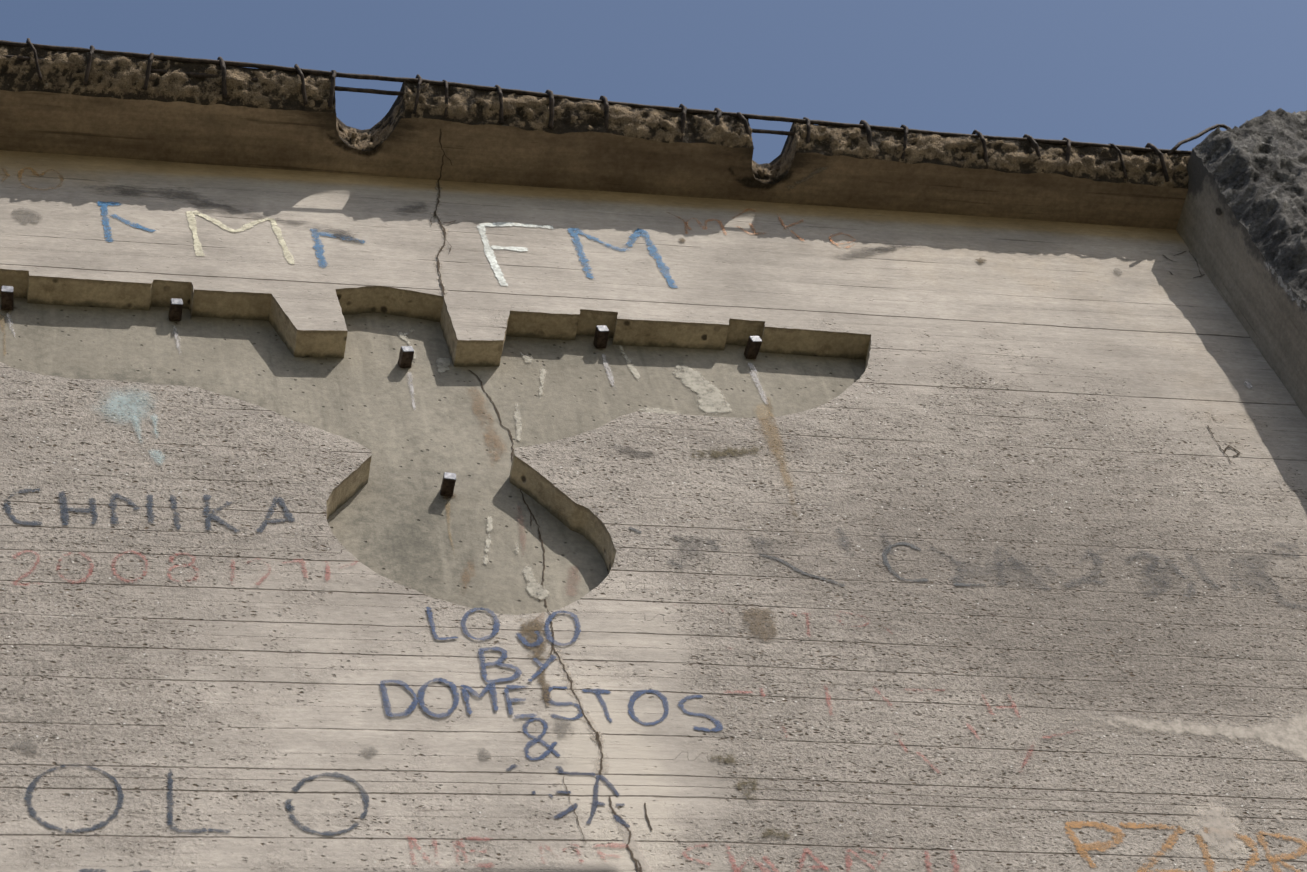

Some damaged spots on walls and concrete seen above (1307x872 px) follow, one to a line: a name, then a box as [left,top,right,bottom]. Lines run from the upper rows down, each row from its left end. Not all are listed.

spalling [0,38,1192,189]
crack [430,129,456,295]
crack [469,370,514,459]
crack [520,489,652,872]